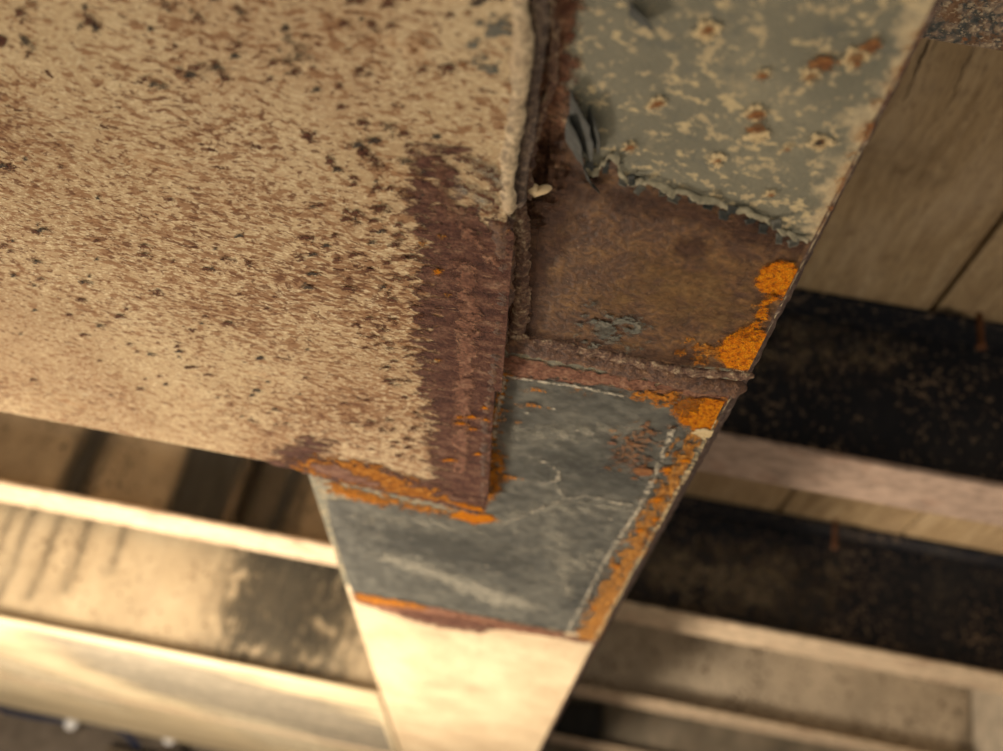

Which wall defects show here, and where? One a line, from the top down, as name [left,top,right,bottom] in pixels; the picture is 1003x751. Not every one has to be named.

peeling [628,0,655,33]
corrosion [799,37,883,87]
corrosion [523,0,811,371]
peeling [565,88,809,248]
corrosion [805,134,841,152]
corrosion [267,142,729,646]
damp [645,546,797,618]